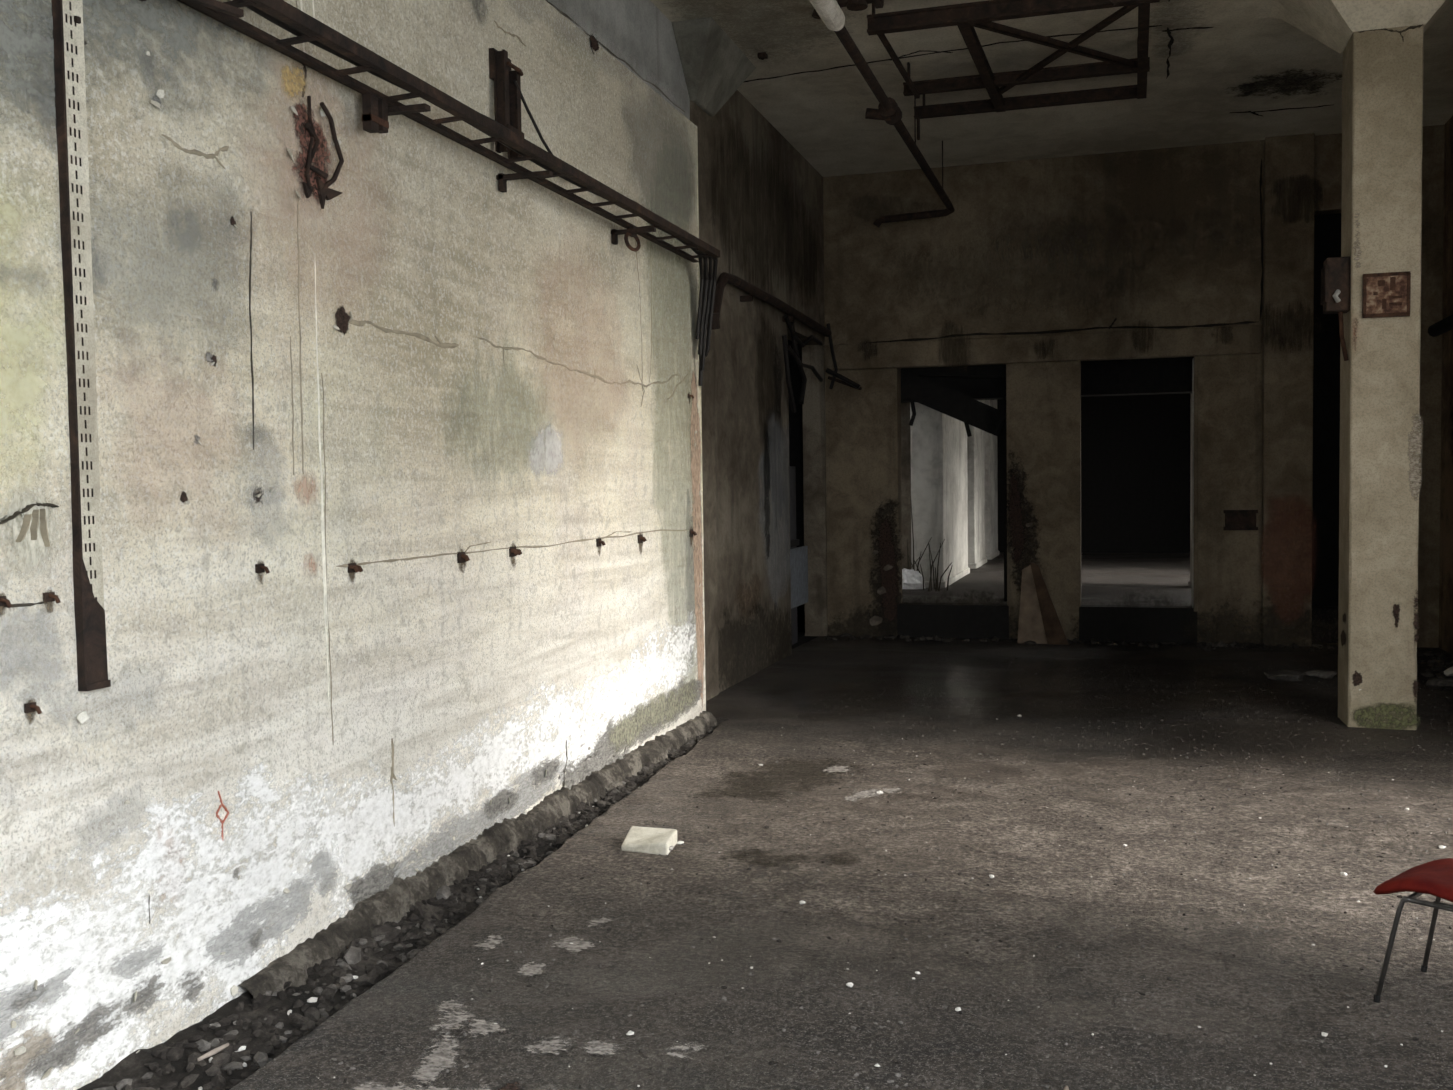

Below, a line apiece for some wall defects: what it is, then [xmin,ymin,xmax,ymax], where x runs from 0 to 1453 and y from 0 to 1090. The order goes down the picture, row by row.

crack [743,0,1213,83]
crack [1359,24,1423,42]
crack [247,211,255,450]
crack [290,197,689,745]
leakage [0,612,697,1090]